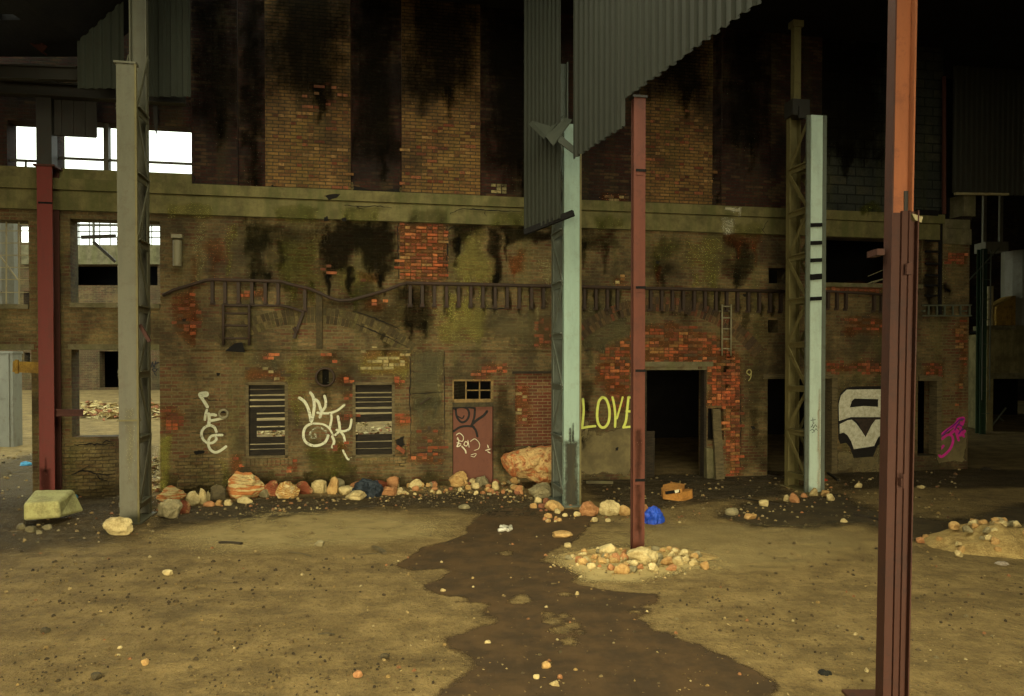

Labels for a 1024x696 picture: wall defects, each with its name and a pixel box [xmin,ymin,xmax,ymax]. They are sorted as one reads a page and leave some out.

water stain [345,267,355,292]
spalling [394,223,448,280]
peeling [581,303,631,476]
spalling [645,326,756,476]